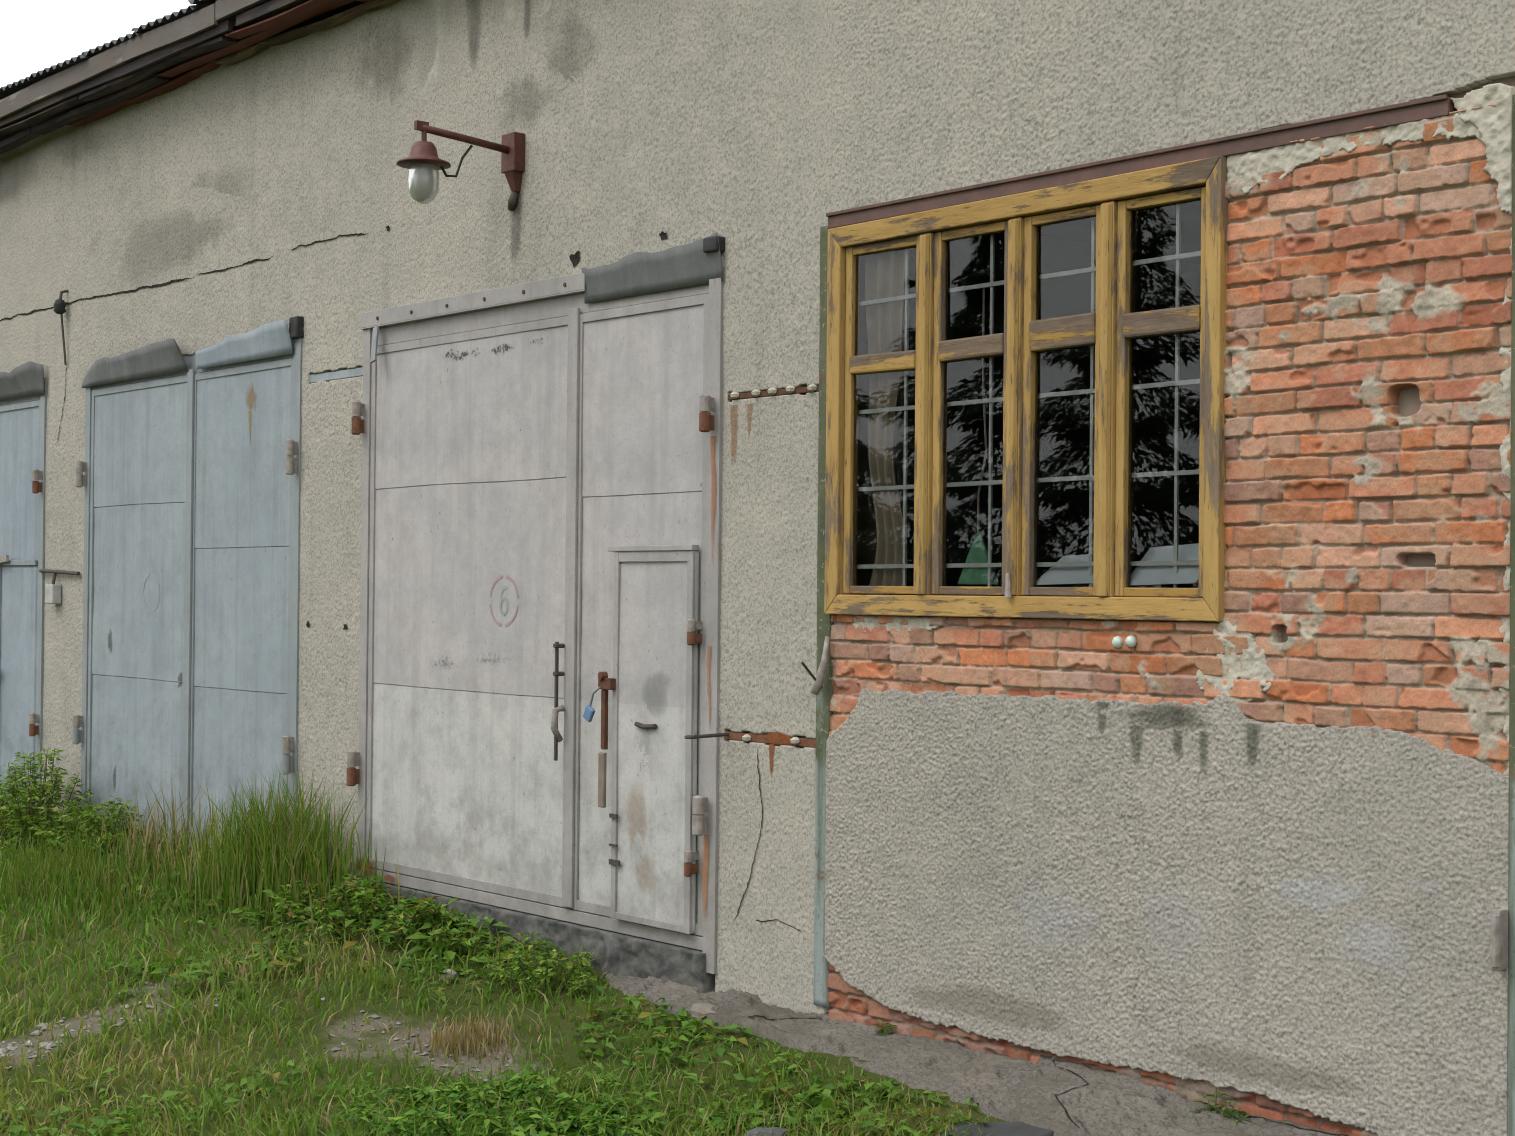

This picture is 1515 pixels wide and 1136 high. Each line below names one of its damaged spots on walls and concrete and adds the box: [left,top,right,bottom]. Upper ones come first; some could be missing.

flaking render [725,83,1515,776]
rust [765,732,792,772]
damp [1134,707,1206,760]
damp [1248,723,1257,760]
flaking render [827,963,1378,1136]